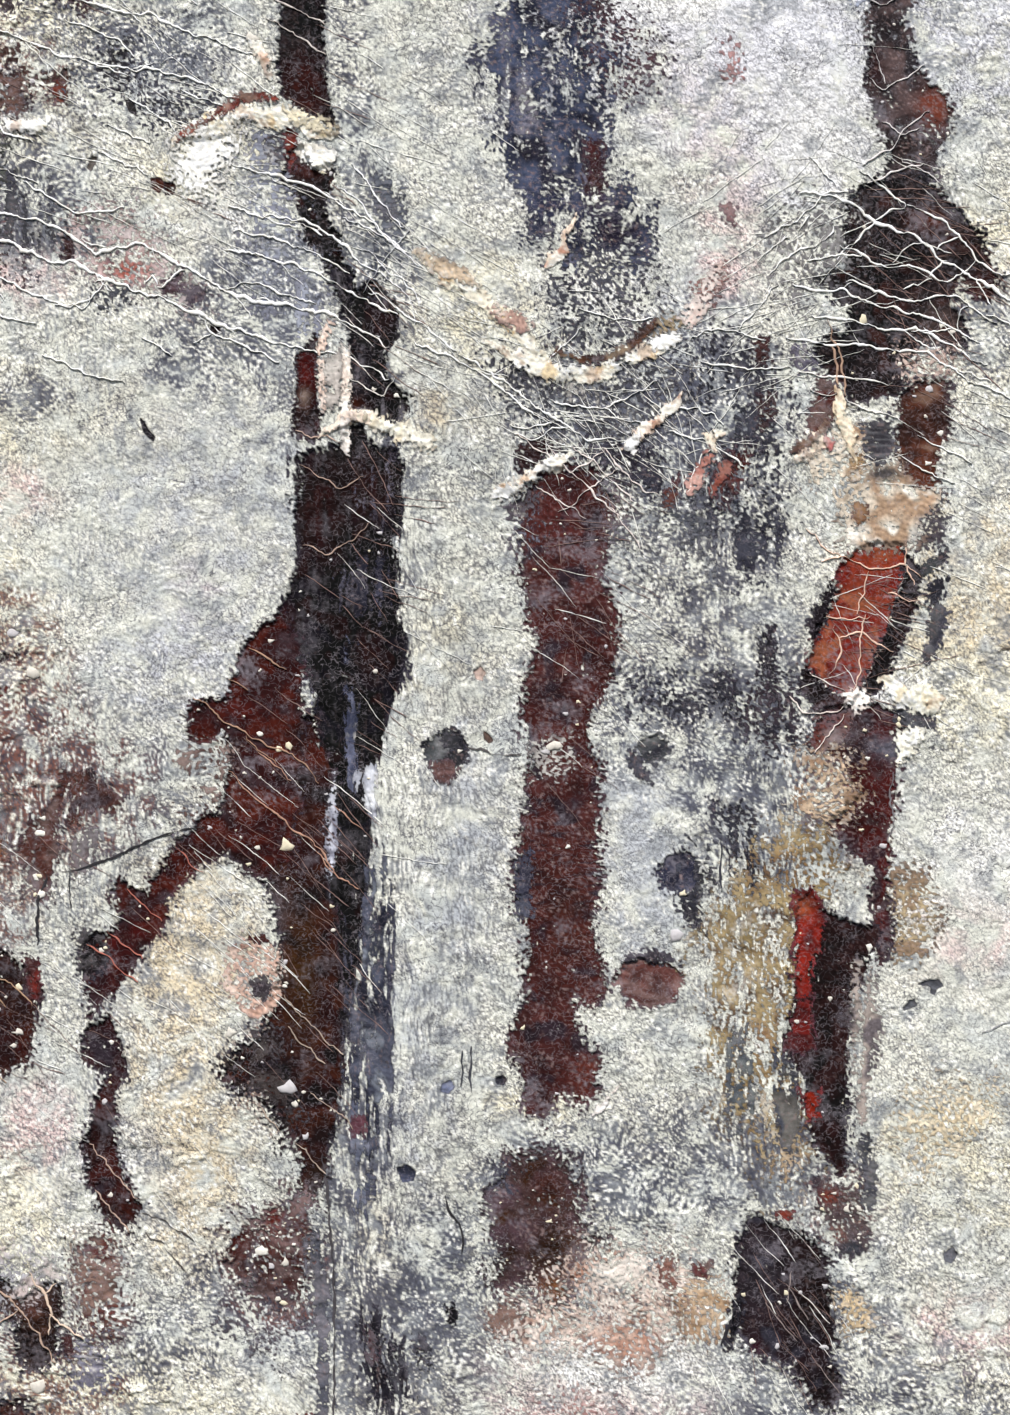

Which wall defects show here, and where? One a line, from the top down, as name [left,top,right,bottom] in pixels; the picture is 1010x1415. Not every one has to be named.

corrosion [0,608,351,1415]
crack [0,648,445,1415]
crack [0,0,1010,787]
crack [549,737,619,839]
corrosion [473,456,737,1415]
damp [462,0,804,608]
corrosion [804,373,846,436]
corrosion [892,370,957,666]